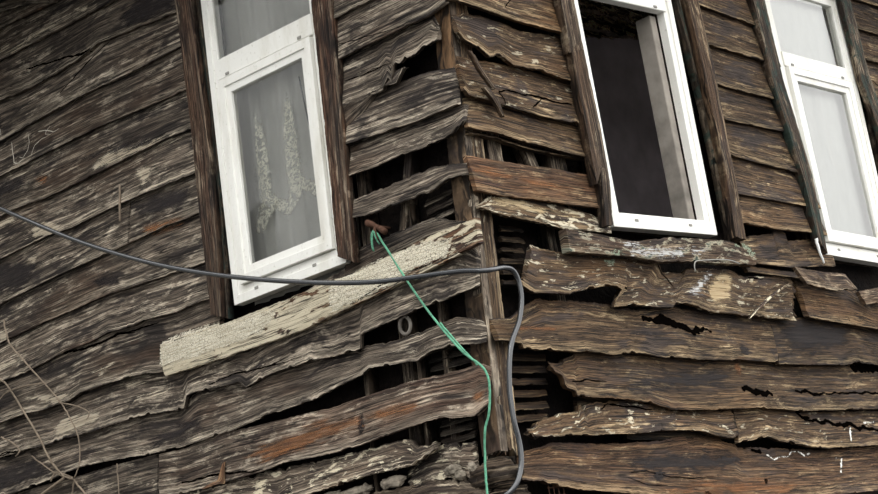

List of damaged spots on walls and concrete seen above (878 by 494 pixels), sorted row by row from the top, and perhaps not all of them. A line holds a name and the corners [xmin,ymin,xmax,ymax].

crack [499,89,572,107]
crack [641,313,712,335]
crack [742,385,773,397]
crack [795,360,878,431]